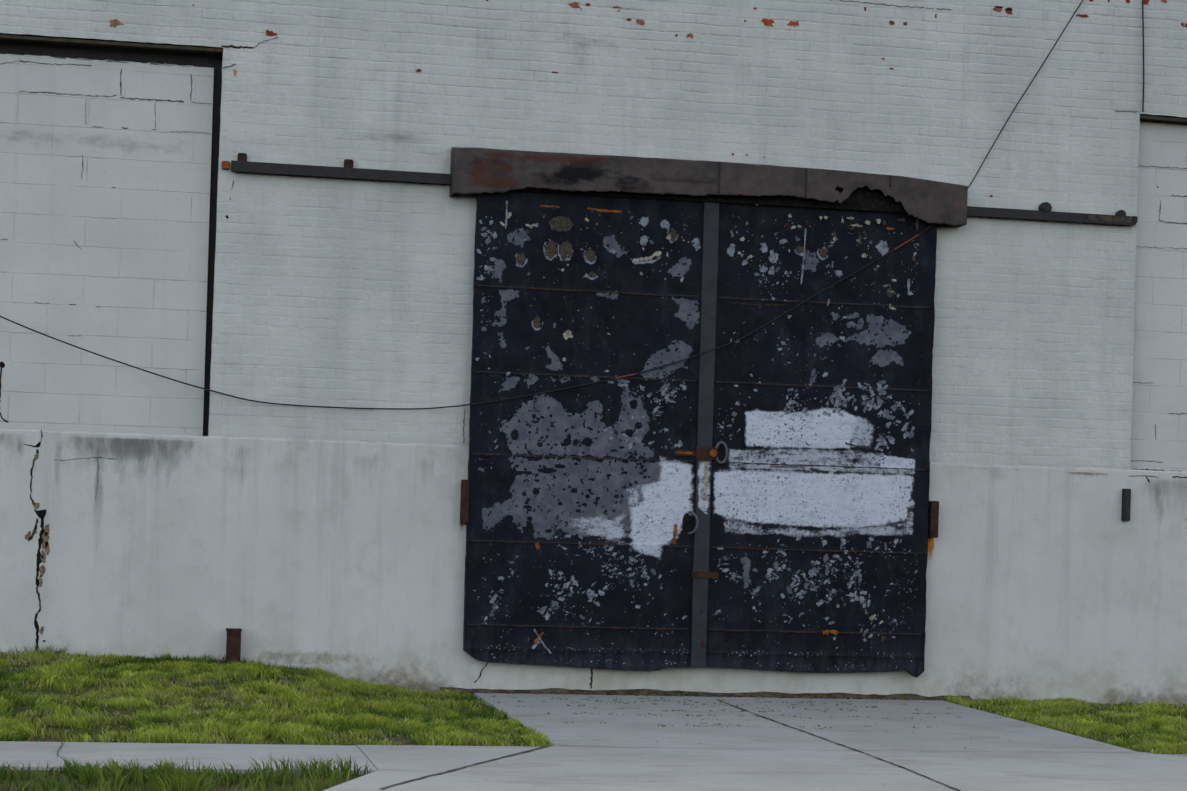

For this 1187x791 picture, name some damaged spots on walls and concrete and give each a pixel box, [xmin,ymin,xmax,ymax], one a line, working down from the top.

peeling [744,7,799,27]
peeling [544,216,627,278]
peeling [639,217,679,246]
peeling [668,238,701,278]
peeling [759,243,779,274]
peeling [876,240,889,256]
peeling [491,228,530,348]
peeling [671,296,700,329]
peeling [815,312,911,367]
peeling [482,340,693,540]
crack [0,361,115,651]
peeling [741,553,751,589]